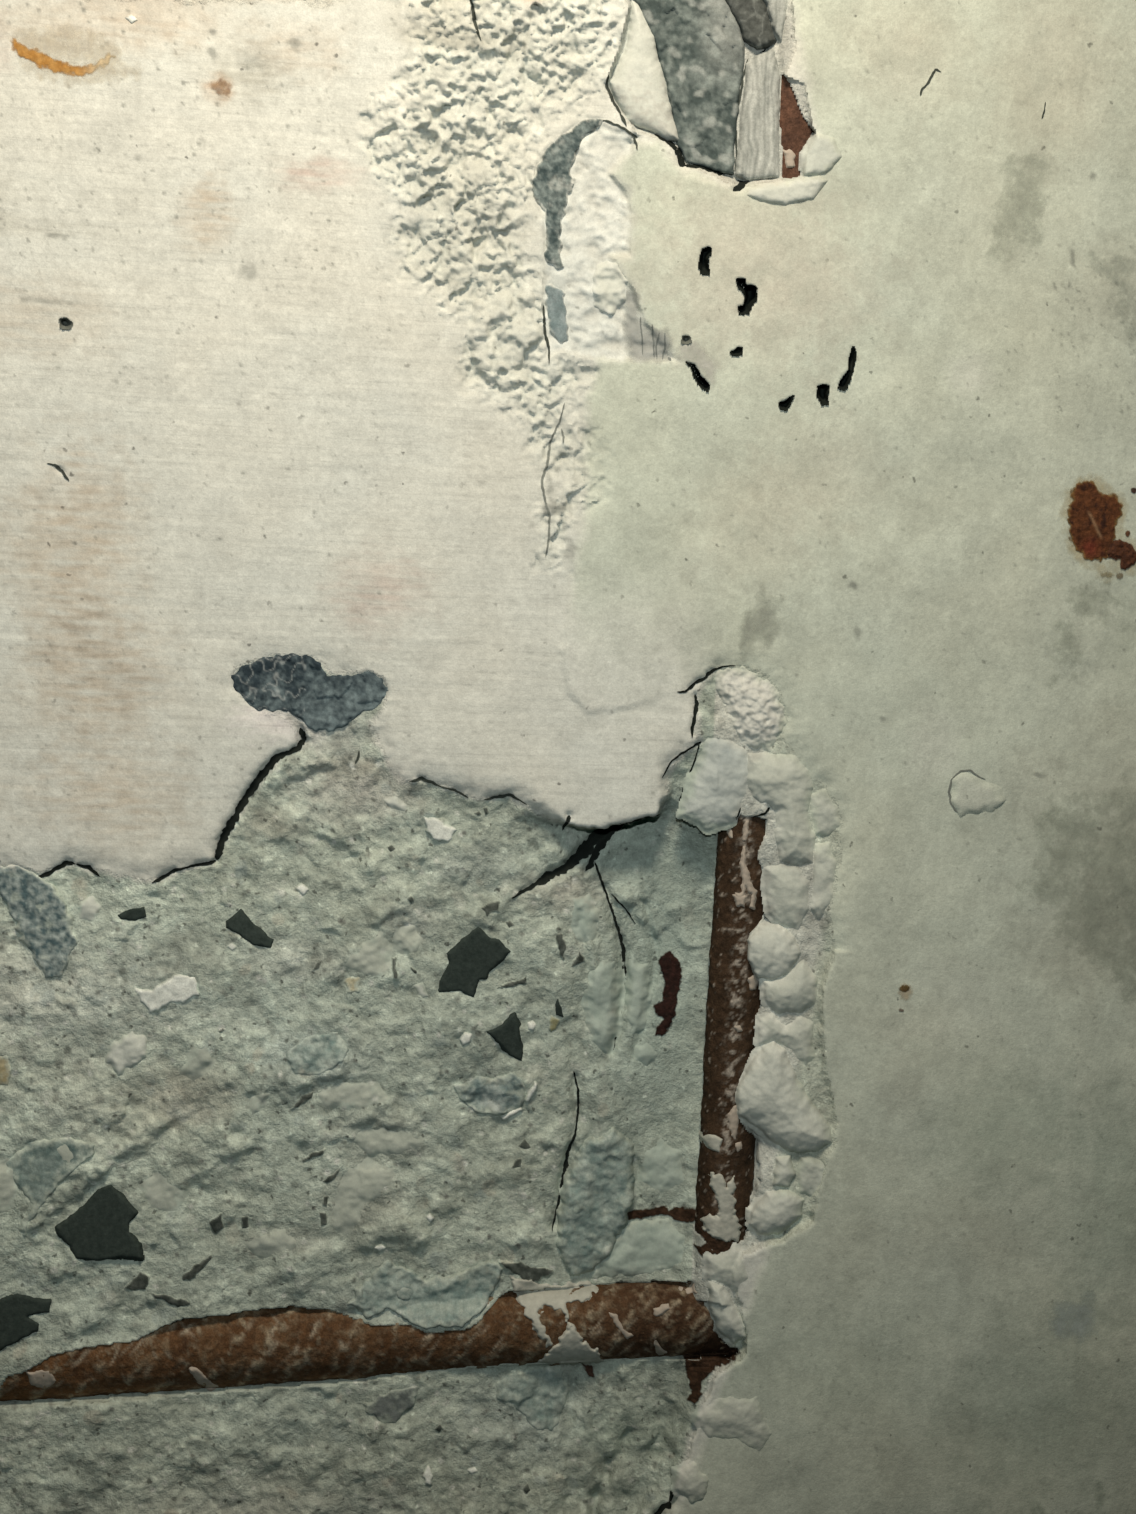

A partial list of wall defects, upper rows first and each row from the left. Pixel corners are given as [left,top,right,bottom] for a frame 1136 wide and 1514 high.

spalling [532,0,842,392]
spalling [778,395,795,411]
rust [1067,480,1136,579]
crack [152,728,306,883]
crack [409,776,527,805]
crack [512,665,736,1050]
rust [653,951,682,1036]
spalling [0,653,844,1514]
crack [552,1071,579,1231]
rust [627,1206,732,1256]
rust [683,1332,740,1404]